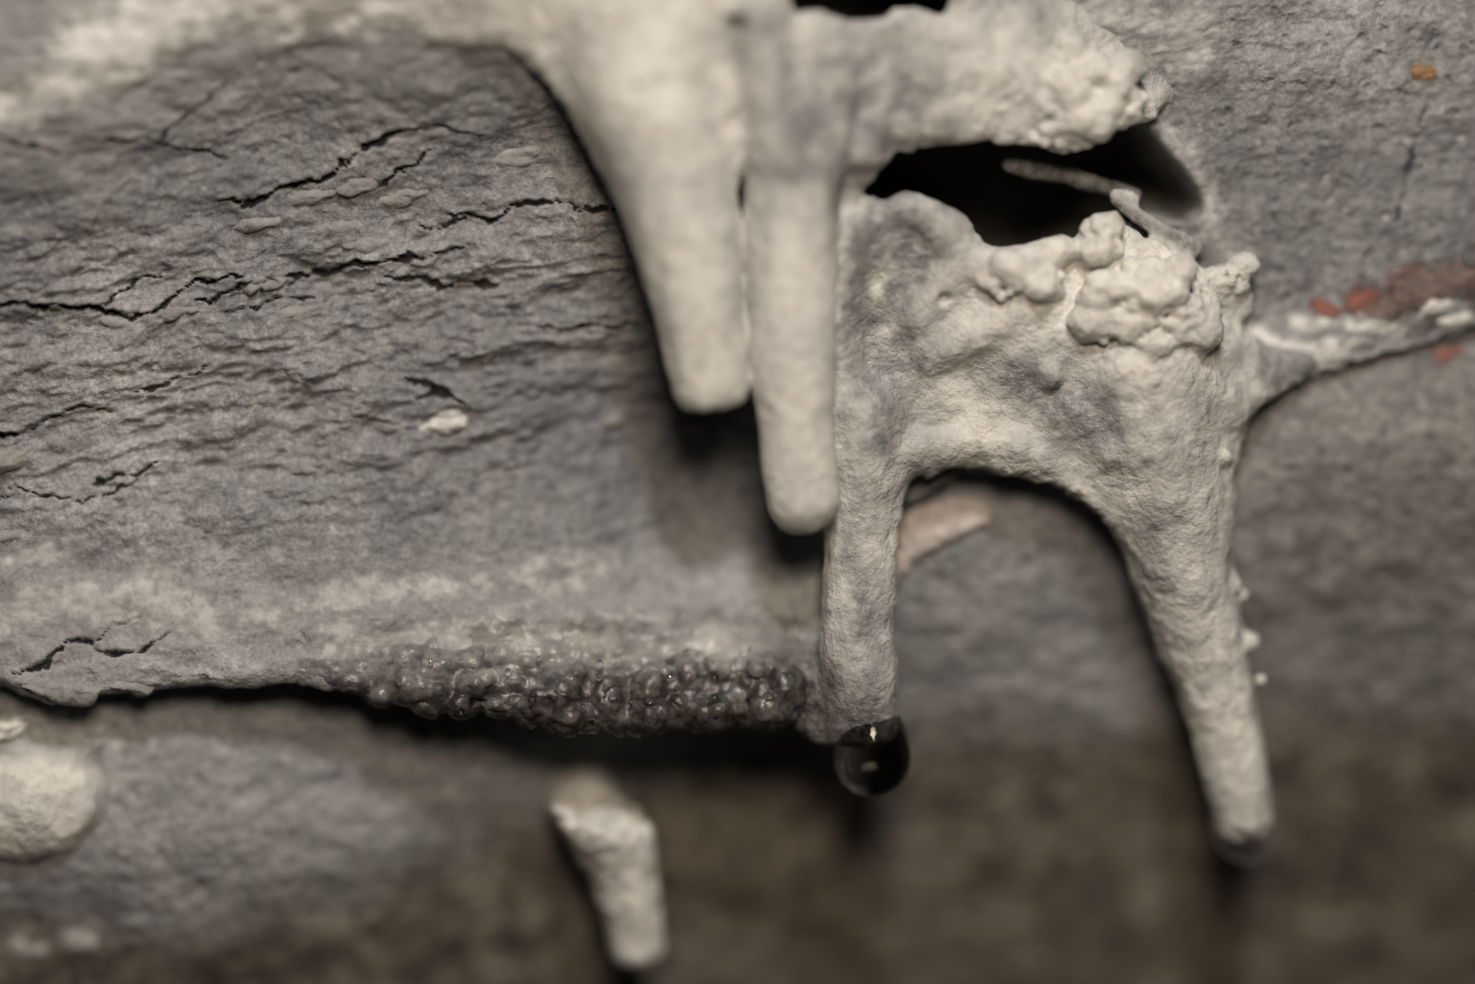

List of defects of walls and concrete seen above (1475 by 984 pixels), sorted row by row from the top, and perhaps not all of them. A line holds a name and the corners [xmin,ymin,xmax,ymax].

crack [1,135,60,154]
crack [96,79,228,156]
crack [218,123,478,209]
crack [0,199,617,321]
crack [546,321,640,330]
damp [0,0,1405,528]
rust [1310,263,1475,321]
crack [0,363,210,438]
crack [352,376,466,430]
crack [0,461,158,504]
damp [0,701,132,809]